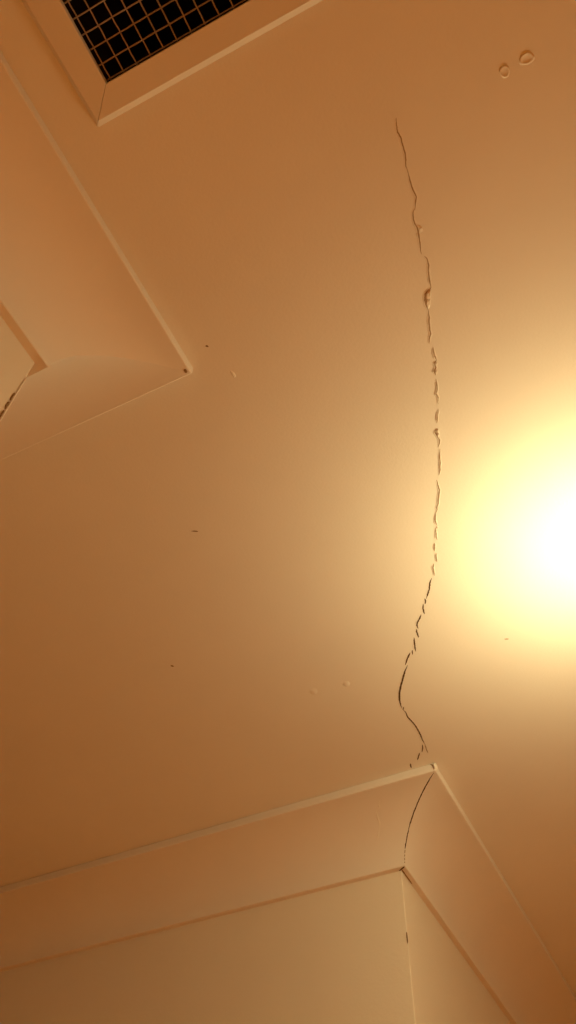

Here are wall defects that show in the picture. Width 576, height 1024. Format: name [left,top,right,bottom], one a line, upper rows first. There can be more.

crack [394,118,442,884]